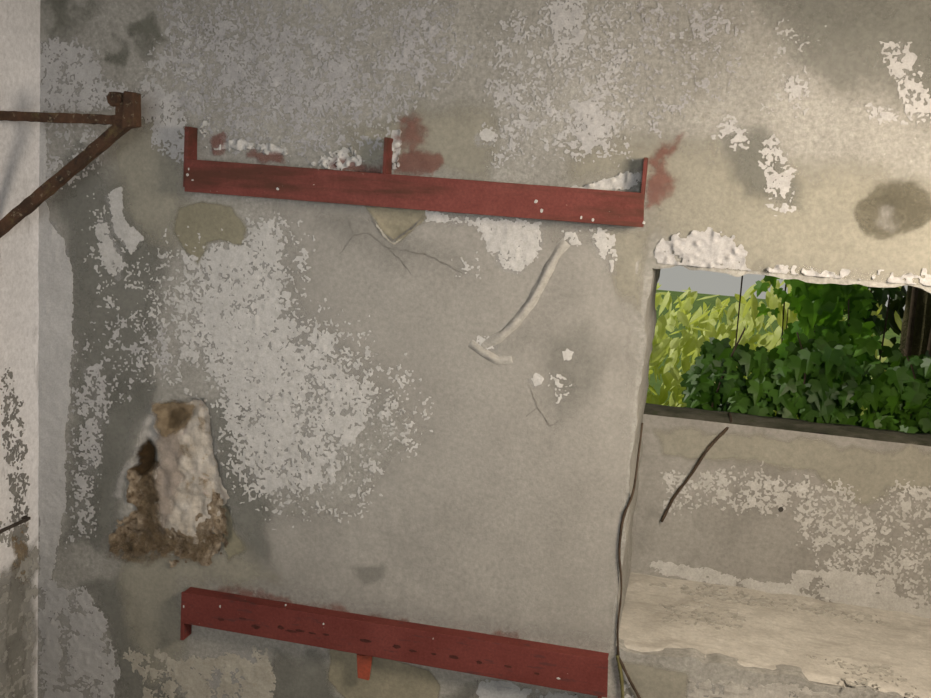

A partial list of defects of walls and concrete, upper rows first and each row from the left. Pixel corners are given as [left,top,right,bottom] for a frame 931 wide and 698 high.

peeling [865,41,931,126]
water stain [855,183,931,238]
crack [340,222,463,274]
spalling [654,227,752,271]
spalling [766,265,861,280]
spalling [872,268,931,286]
peeling [0,187,434,698]
peeling [650,461,931,619]
peeling [476,679,578,698]